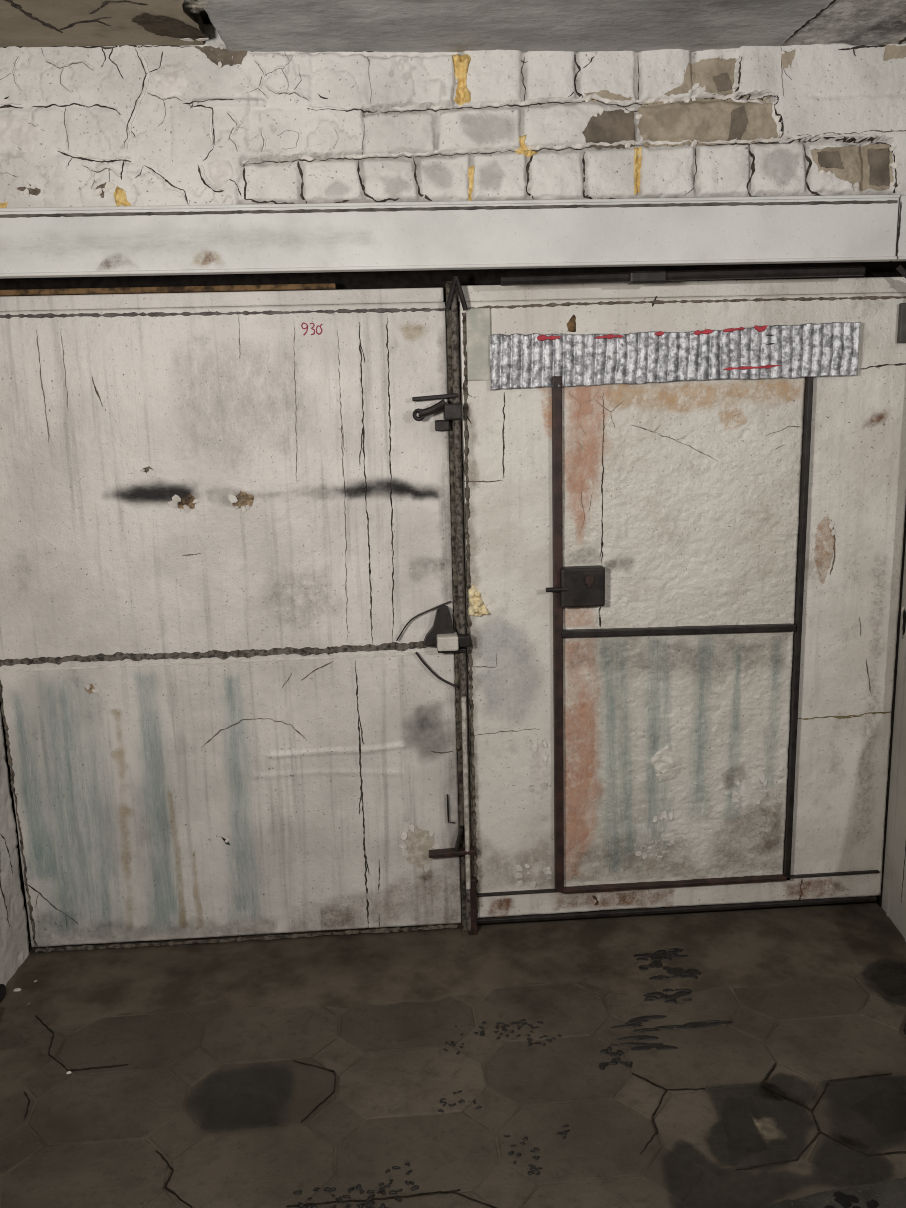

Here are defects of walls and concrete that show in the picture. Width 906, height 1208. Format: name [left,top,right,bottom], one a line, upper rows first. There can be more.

crack [0,0,906,256]
flaking render [582,55,781,149]
flaking render [810,144,900,192]
crack [282,318,394,928]
leakage [863,960,906,1005]
crack [35,1016,128,1072]
crack [293,1060,336,1123]
leakage [663,1074,906,1208]
crack [156,1150,193,1208]
crack [286,1189,497,1208]